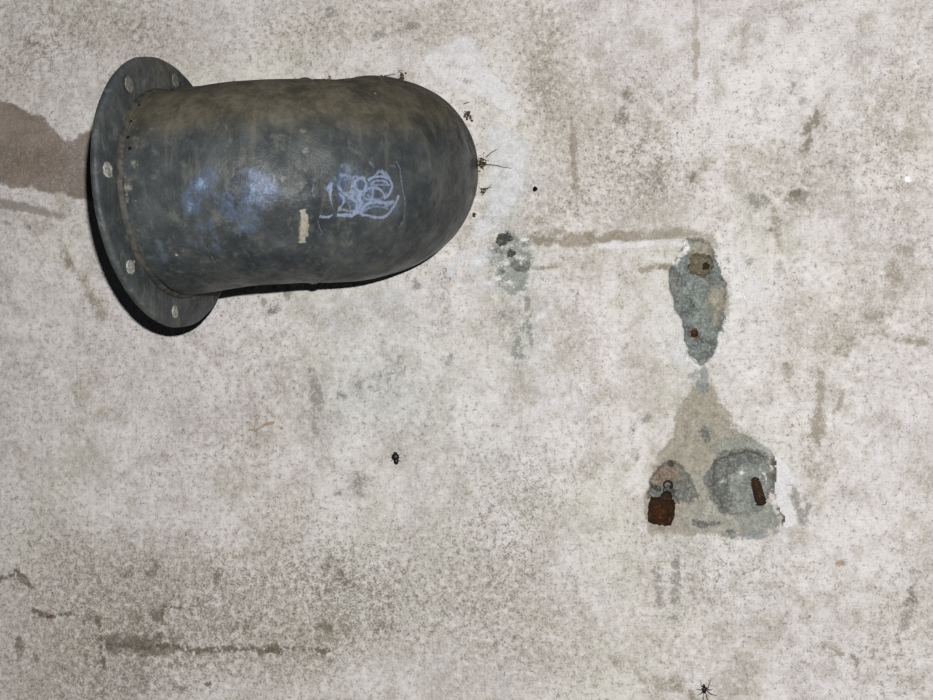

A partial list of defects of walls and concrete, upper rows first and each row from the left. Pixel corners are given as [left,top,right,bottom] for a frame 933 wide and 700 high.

damp [0,102,93,201]
flaking render [669,235,729,394]
flaking render [648,449,773,514]